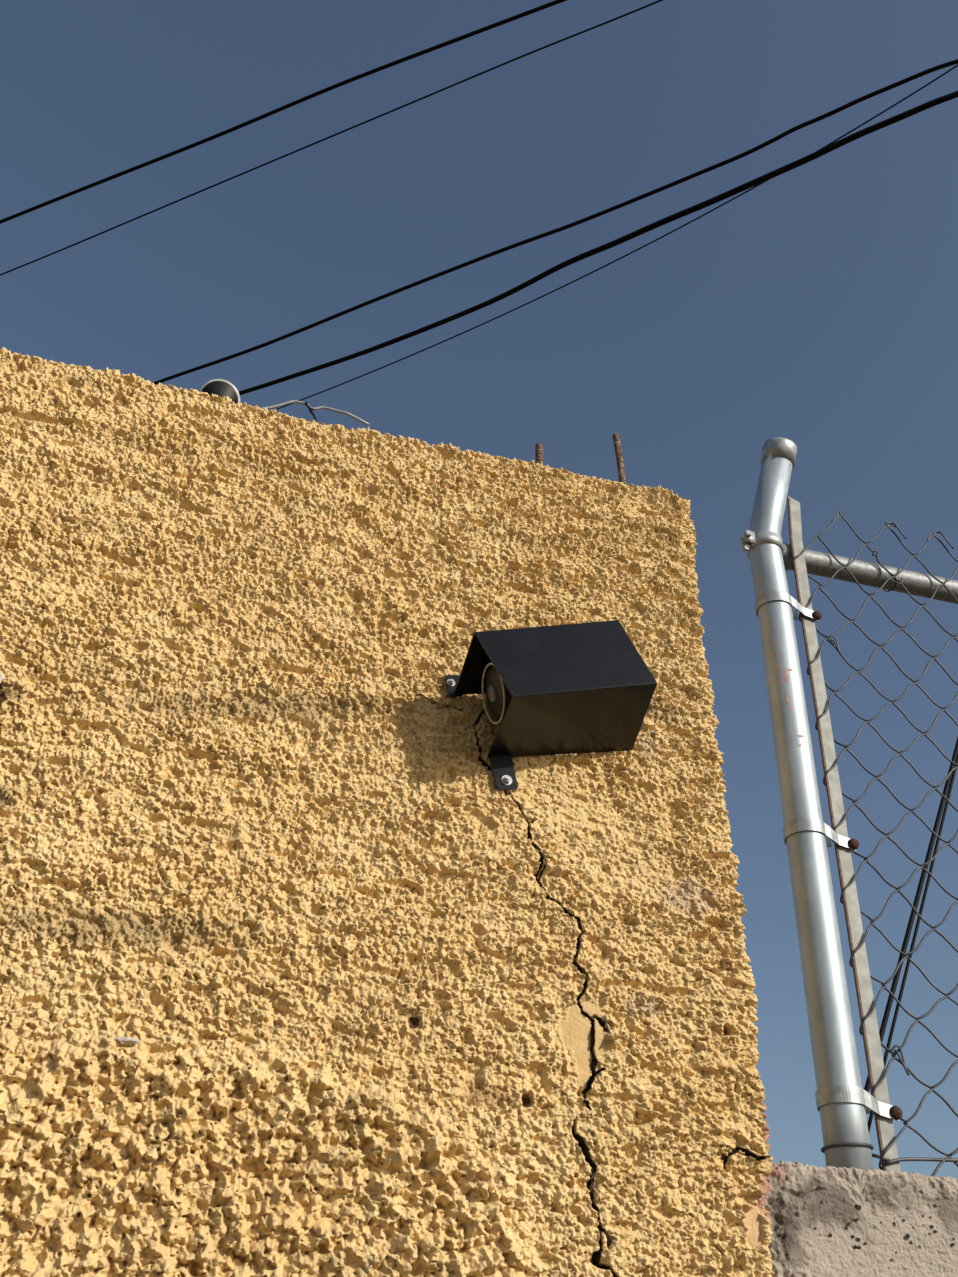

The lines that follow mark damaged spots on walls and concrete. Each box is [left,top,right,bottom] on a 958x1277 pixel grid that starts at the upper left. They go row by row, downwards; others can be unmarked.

crack [416,694,618,1277]
crack [721,1148,767,1169]